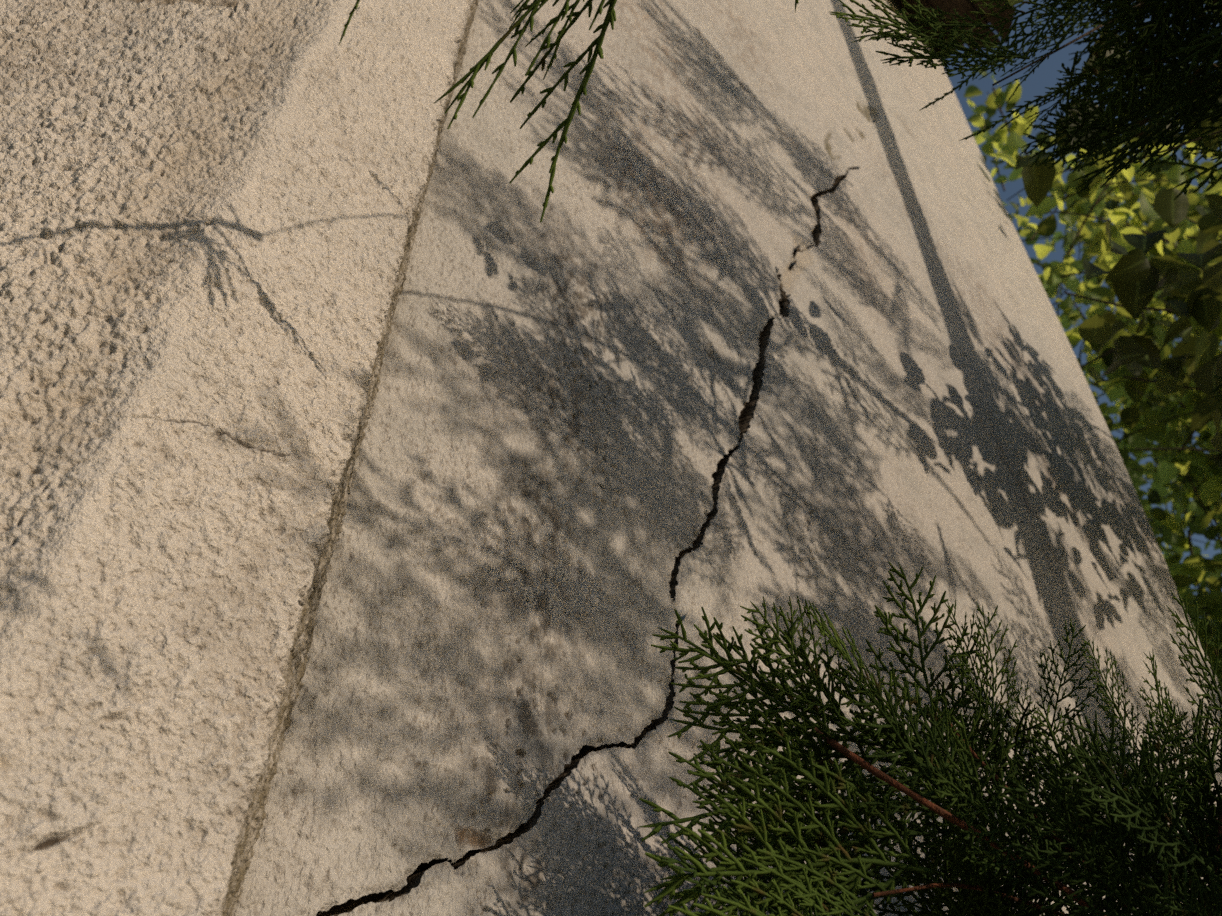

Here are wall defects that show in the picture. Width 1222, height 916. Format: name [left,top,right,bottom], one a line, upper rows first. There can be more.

crack [316,164,857,916]